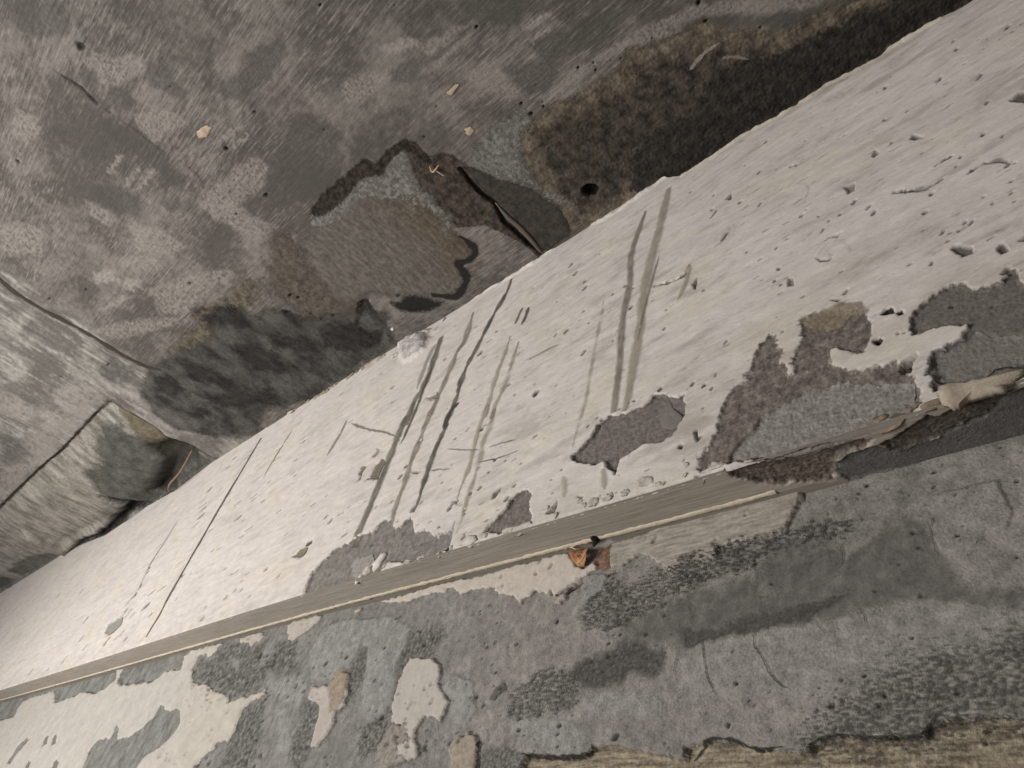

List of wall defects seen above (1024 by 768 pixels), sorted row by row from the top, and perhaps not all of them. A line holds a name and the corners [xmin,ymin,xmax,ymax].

spalling [311,139,530,246]
water stain [467,0,971,413]
water stain [141,151,478,439]
water stain [352,279,519,548]
flaking render [572,394,686,474]
flaking render [609,269,1024,572]
flaking render [306,490,532,593]
corrosion [593,546,611,570]
water stain [489,519,1015,721]
flaking render [0,643,266,768]
flaking render [308,670,349,748]
flaking render [374,657,449,768]